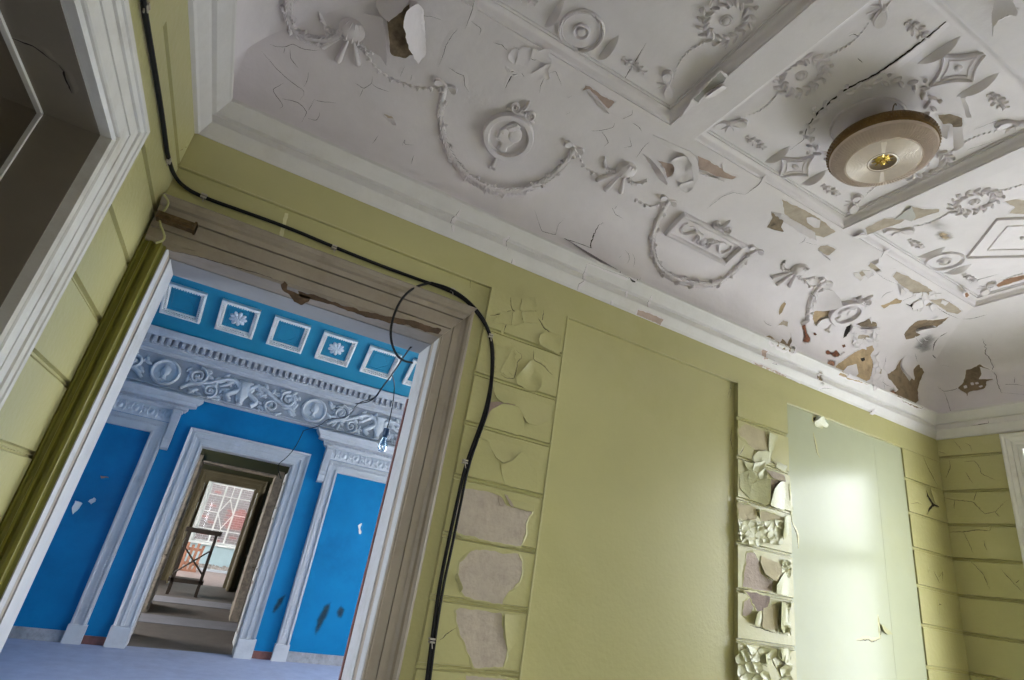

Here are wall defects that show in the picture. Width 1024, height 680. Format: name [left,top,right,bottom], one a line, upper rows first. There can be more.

peeling [363,0,426,66]
crack [424,0,536,91]
crack [790,21,949,151]
peeling [643,135,739,193]
peeling [766,198,837,260]
crack [490,297,559,379]
peeling [812,289,928,410]
peeling [852,258,970,340]
peeling [454,344,551,680]
peeling [735,423,793,680]
damp [316,605,344,632]
crack [856,616,881,642]